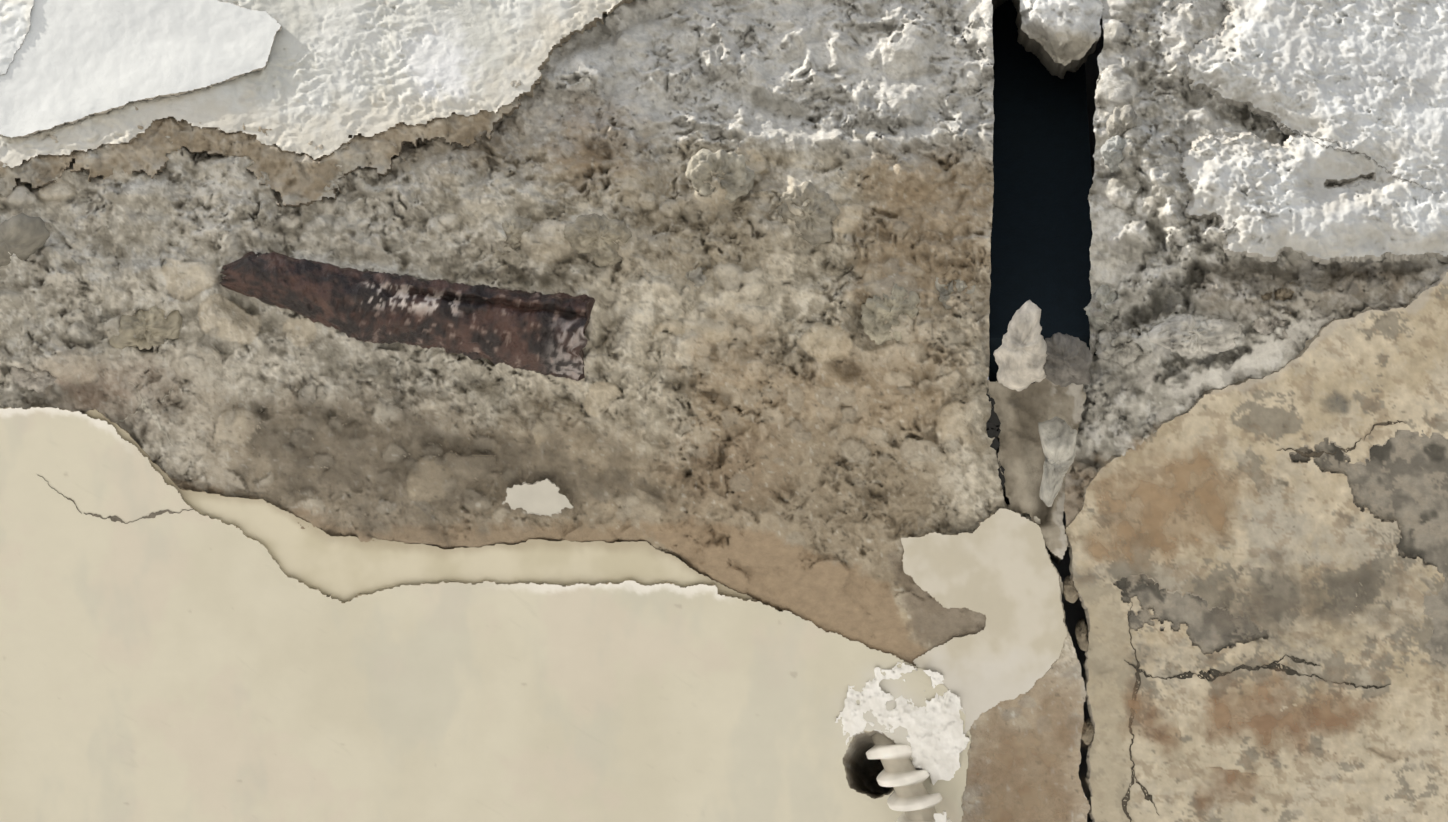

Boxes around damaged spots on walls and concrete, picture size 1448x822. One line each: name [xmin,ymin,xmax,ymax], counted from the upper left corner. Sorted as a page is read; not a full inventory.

crack [38,475,194,524]
spalling [0,0,1041,668]
spalling [843,730,894,799]
crack [986,389,1005,493]
spalling [933,546,1090,822]
flaking render [1114,574,1268,654]
crack [1122,585,1390,822]
flaking render [1290,430,1448,665]